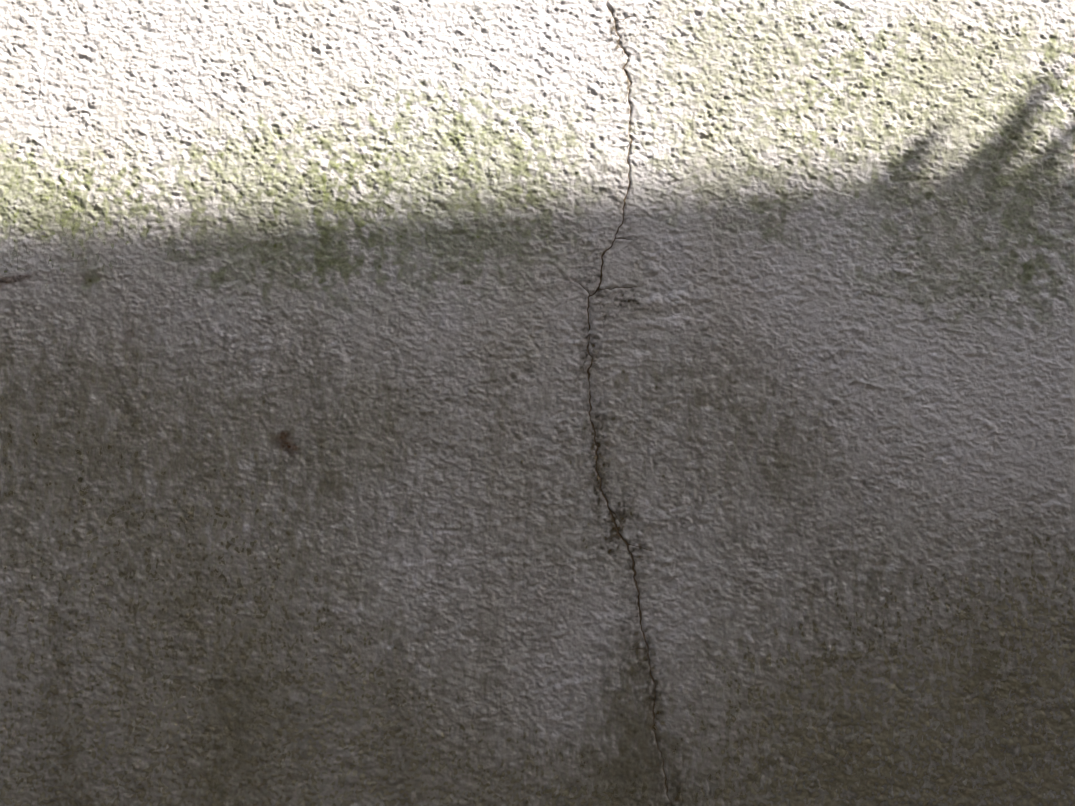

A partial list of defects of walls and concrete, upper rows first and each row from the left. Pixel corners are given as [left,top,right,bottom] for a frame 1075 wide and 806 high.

crack [573,0,681,806]